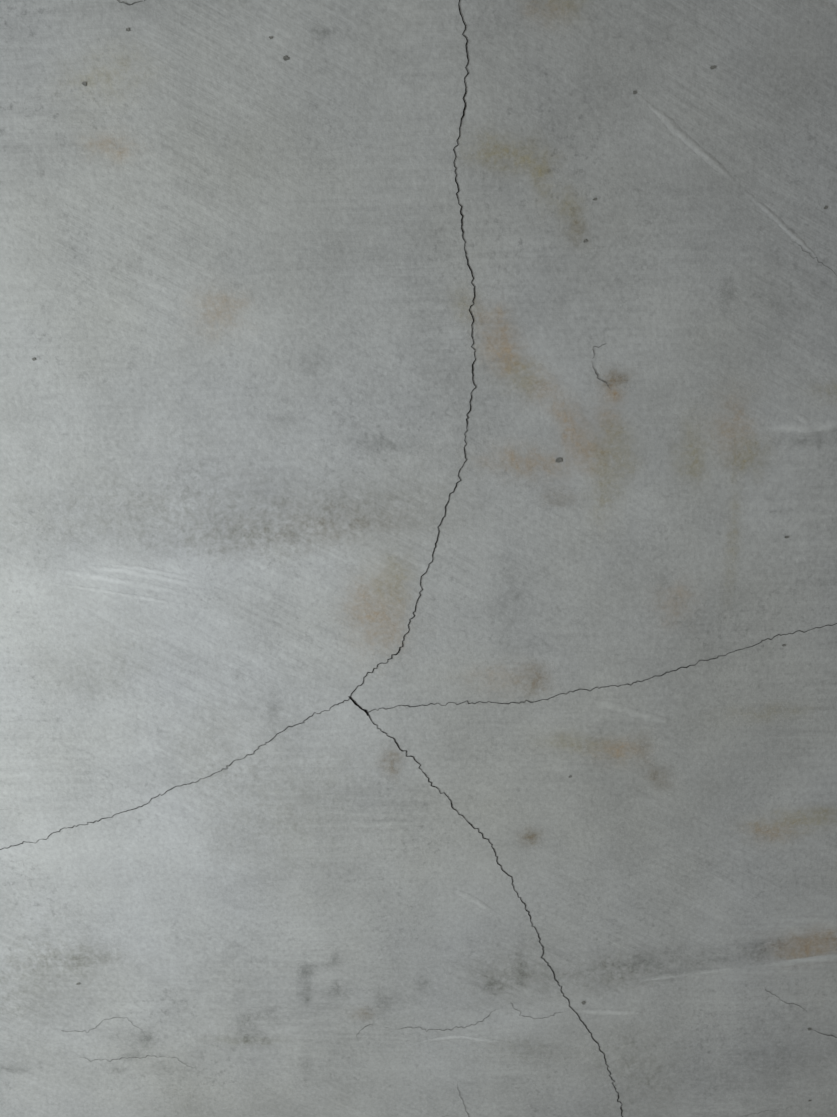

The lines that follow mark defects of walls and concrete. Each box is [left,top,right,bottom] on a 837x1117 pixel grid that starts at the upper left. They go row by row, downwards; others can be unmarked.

crack [86,0,654,1116]
crack [661,623,837,676]
crack [61,1017,193,1068]